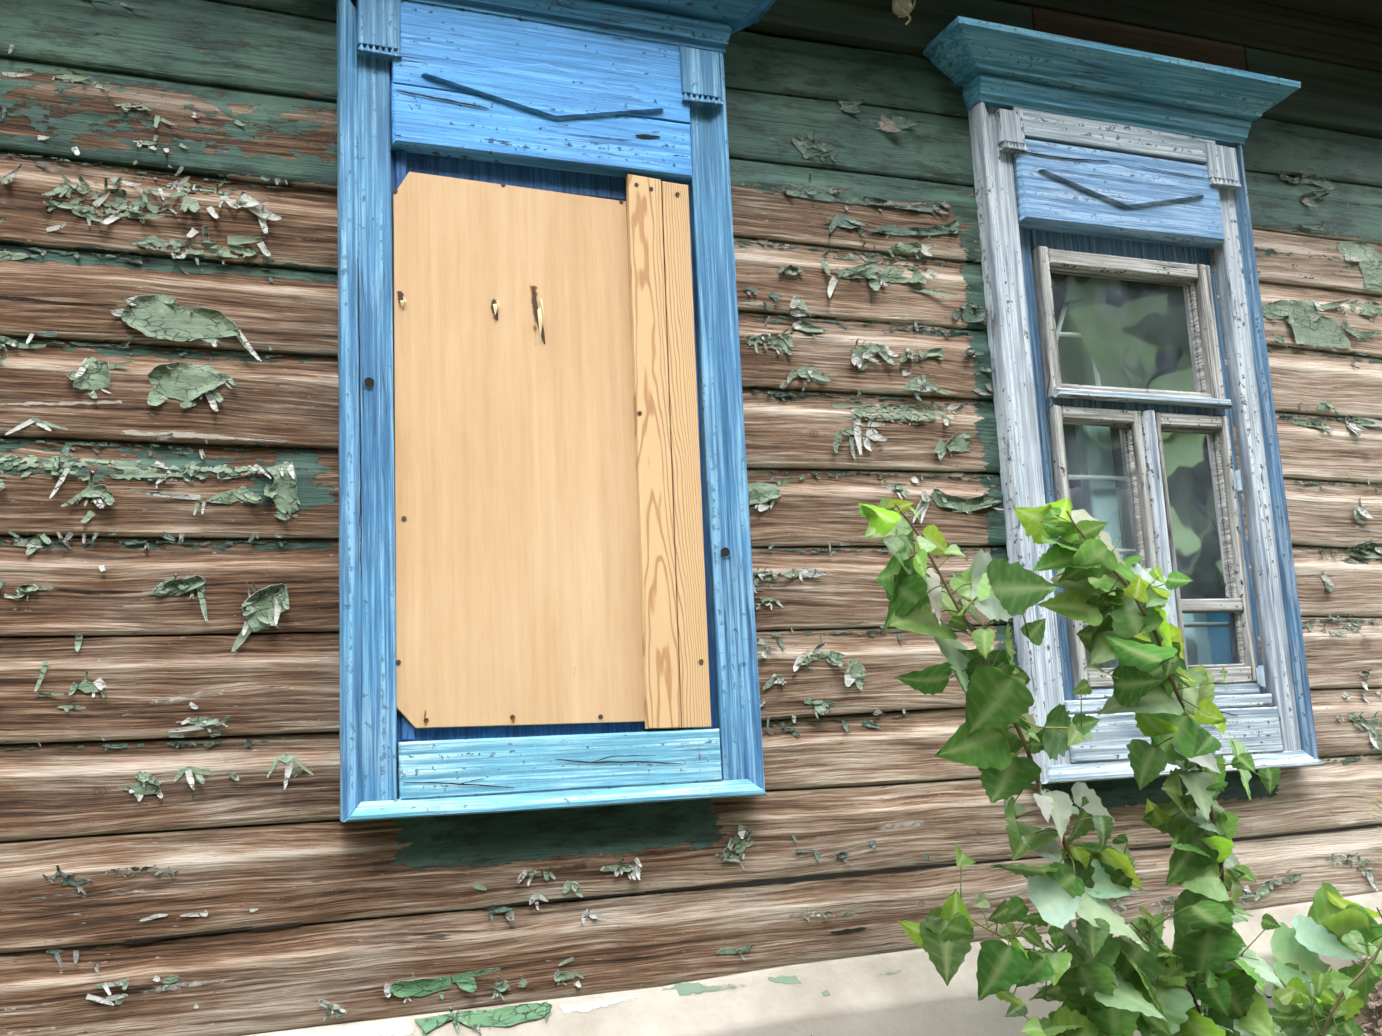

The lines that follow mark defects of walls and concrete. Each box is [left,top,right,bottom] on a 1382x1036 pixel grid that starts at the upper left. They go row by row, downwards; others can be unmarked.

peeling [1262,171,1382,368]
peeling [0,294,283,412]
peeling [736,132,1005,523]
peeling [0,417,300,555]
peeling [1292,477,1382,593]
peeling [149,574,207,622]
peeling [232,582,290,652]
peeling [34,662,106,712]
peeling [166,702,230,748]
peeling [117,766,239,802]
peeling [488,869,608,925]
peeling [600,857,642,881]